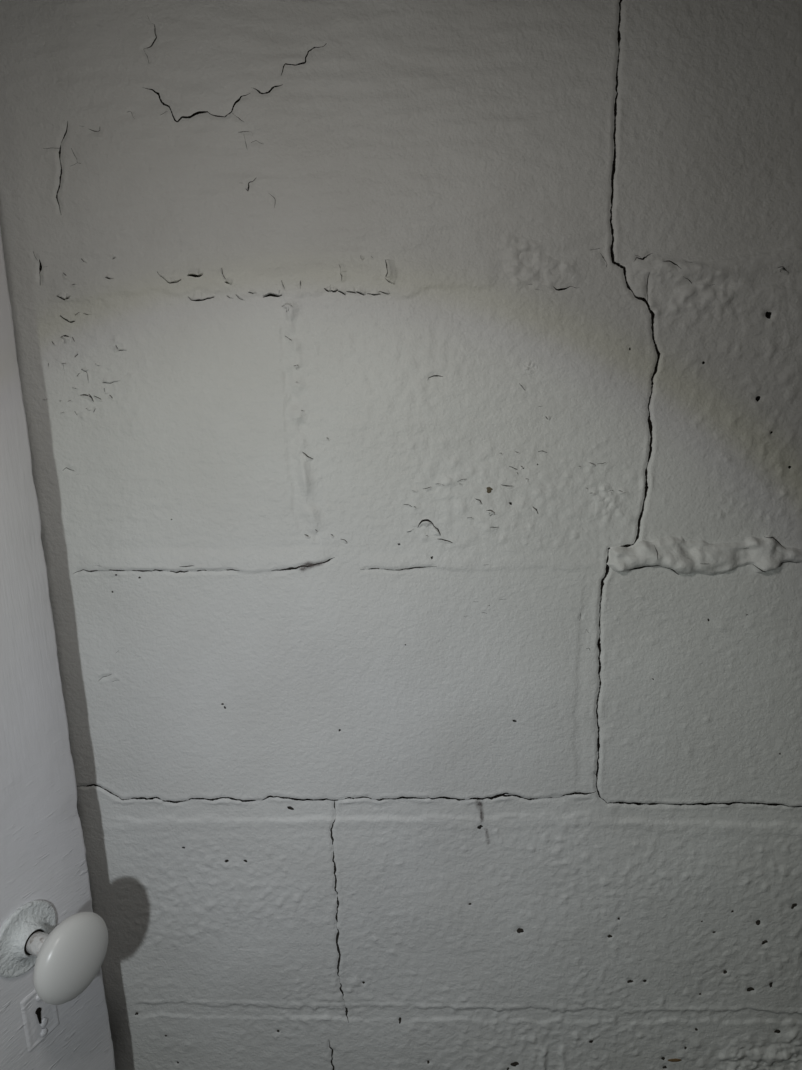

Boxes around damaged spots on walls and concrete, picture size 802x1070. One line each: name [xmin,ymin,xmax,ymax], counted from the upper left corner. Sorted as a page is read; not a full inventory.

crack [43,122,100,213]
crack [143,23,327,148]
crack [591,0,660,547]
crack [73,548,802,1023]